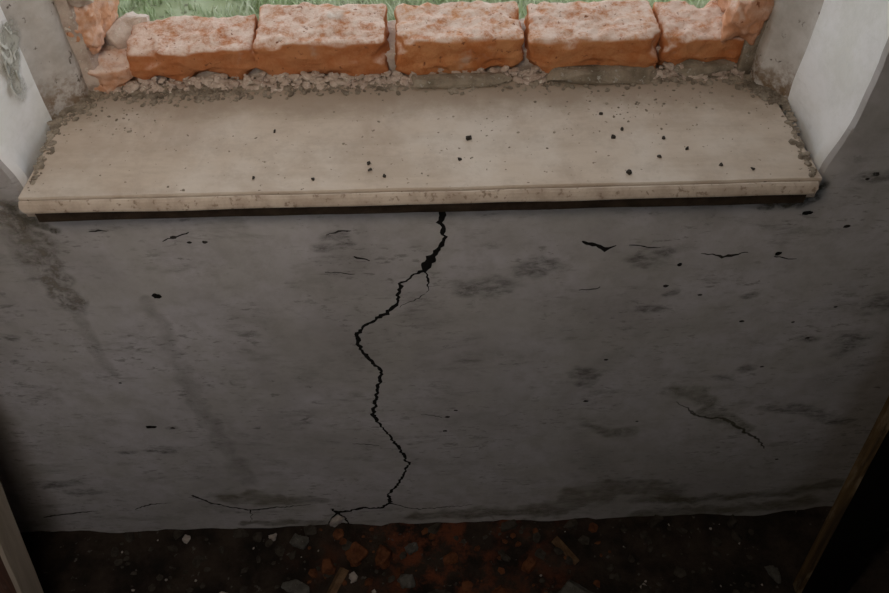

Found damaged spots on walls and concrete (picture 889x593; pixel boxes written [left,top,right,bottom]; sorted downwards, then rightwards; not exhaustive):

peeling [0,21,25,100]
crack [328,212,471,524]
crack [677,402,765,449]
crack [191,495,311,522]